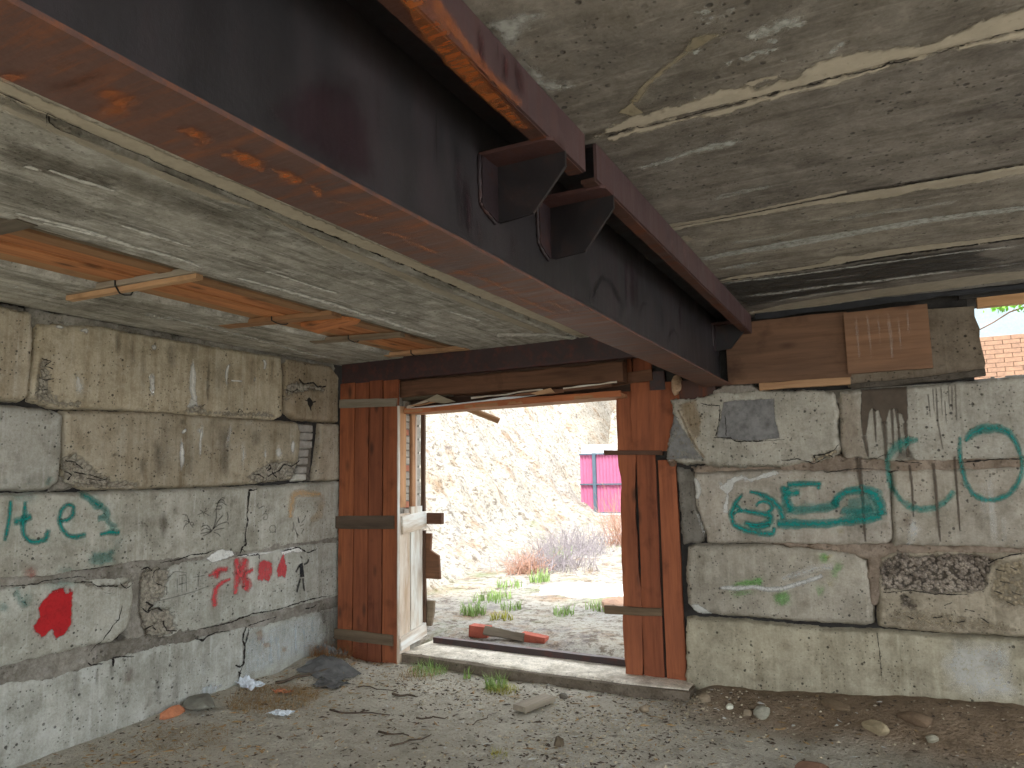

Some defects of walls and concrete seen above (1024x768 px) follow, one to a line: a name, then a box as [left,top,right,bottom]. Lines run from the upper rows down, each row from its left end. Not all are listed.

rust [402,0,527,128]
peeling [596,9,1024,141]
spalling [60,454,137,489]
crack [141,489,316,571]
spalling [248,460,300,483]
leakage [856,387,914,542]
leakage [932,463,941,541]
crack [1,565,111,587]
crack [88,608,134,667]
spalling [74,567,176,638]
crack [195,596,327,684]
spalling [880,550,1024,609]